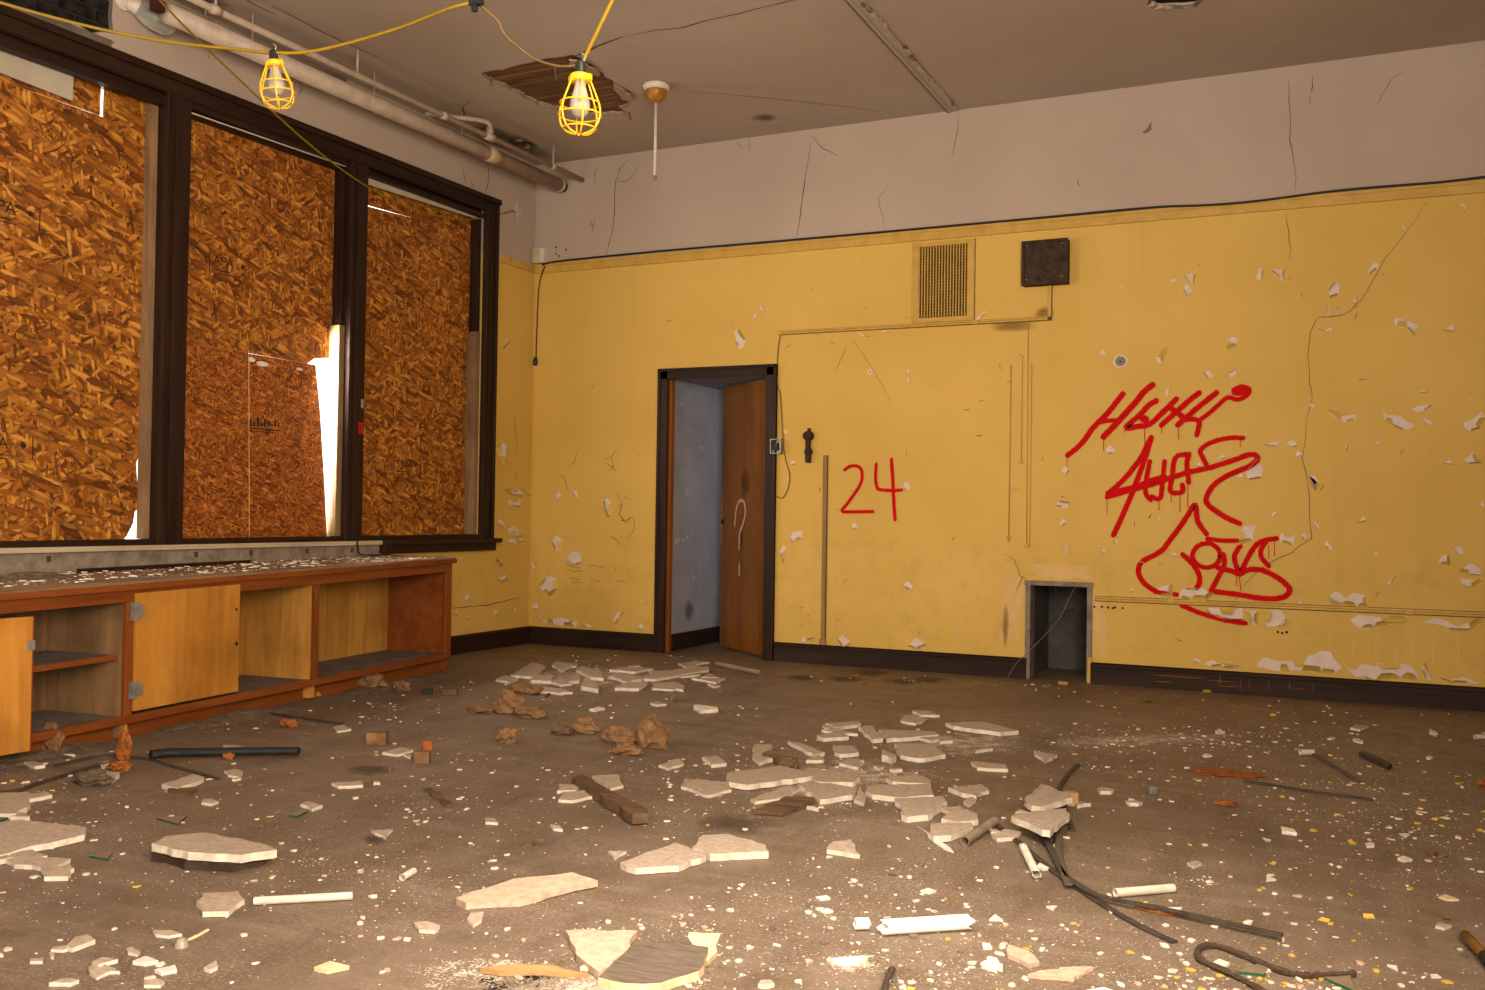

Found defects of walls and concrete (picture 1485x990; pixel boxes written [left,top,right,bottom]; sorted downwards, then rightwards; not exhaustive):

flaking render [481,55,634,120]
crack [1286,77,1313,253]
flaking render [1100,349,1128,368]
crack [1235,202,1427,600]
peeling [1383,389,1434,430]
peeling [496,440,508,465]
peeling [1237,439,1304,480]
peeling [1271,511,1333,549]
peeling [1439,546,1481,587]
peeling [493,558,592,628]
peeling [1156,583,1302,627]
peeling [1329,591,1482,629]